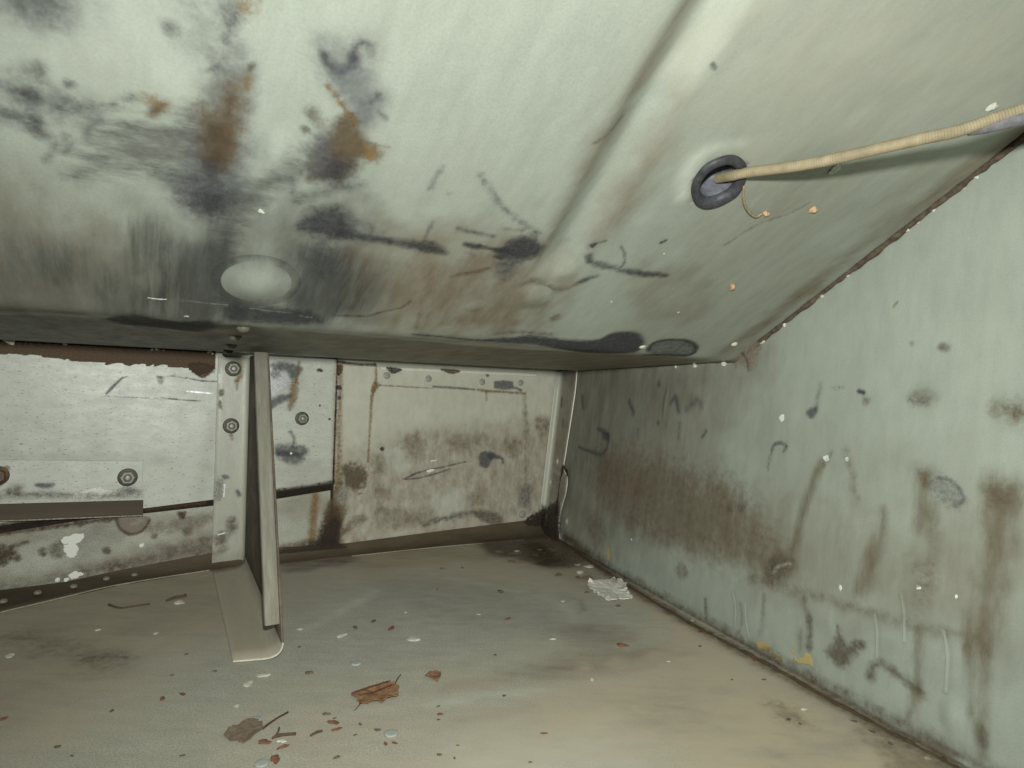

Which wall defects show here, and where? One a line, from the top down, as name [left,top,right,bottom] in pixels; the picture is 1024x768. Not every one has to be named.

rust [308,103,377,181]
rust [276,359,399,546]
rust [0,517,116,565]
peeling [51,533,84,558]
rust [144,501,207,534]
peeling [55,571,84,582]